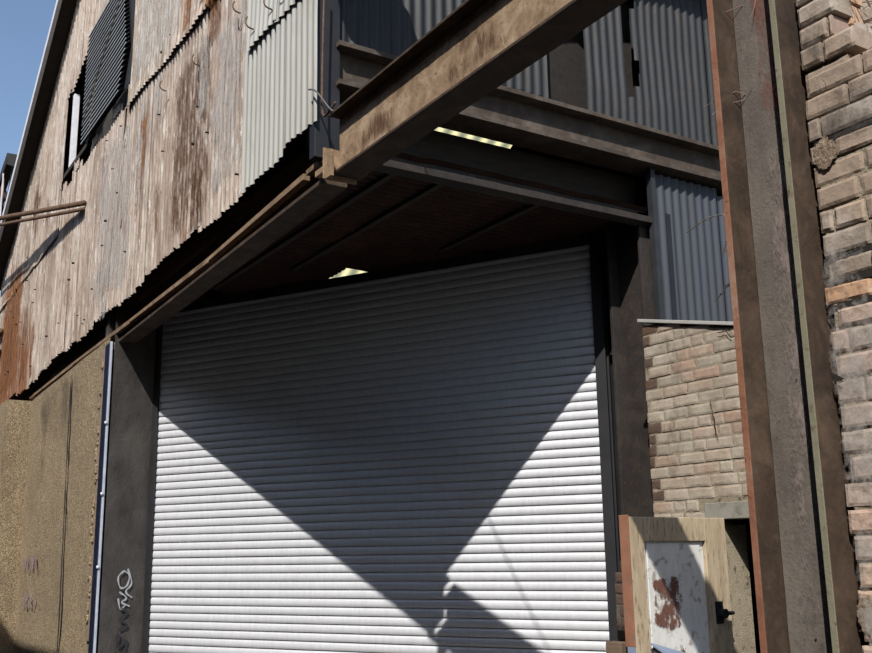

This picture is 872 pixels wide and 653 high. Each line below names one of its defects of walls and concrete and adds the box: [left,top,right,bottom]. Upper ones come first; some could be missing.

rust [172,0,219,231]
rust [753,0,779,106]
rust [0,269,34,395]